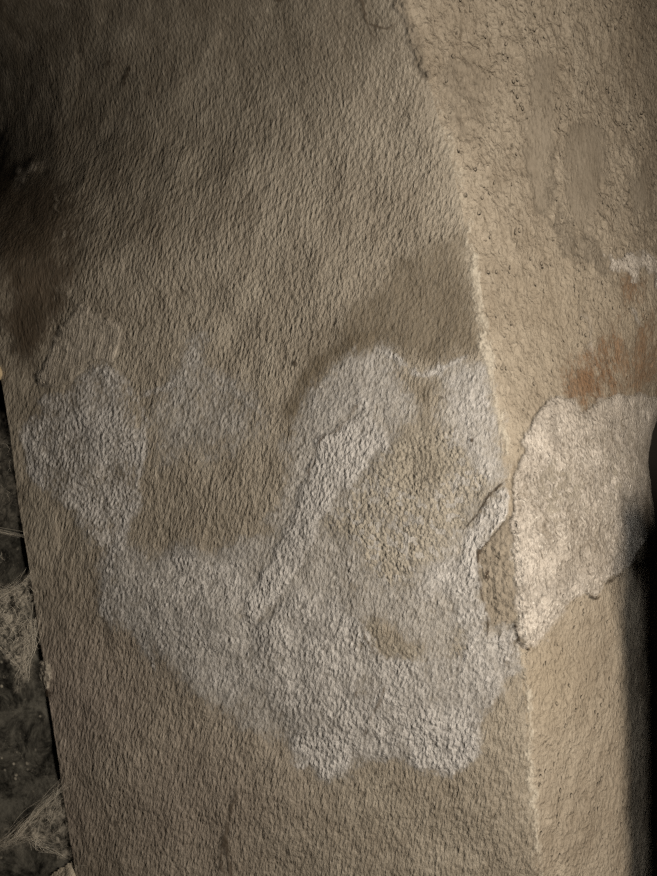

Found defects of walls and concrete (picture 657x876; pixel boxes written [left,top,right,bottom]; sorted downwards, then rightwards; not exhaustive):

efflorescence [604,250,657,288]
efflorescence [21,347,657,783]
flaking render [318,427,530,662]